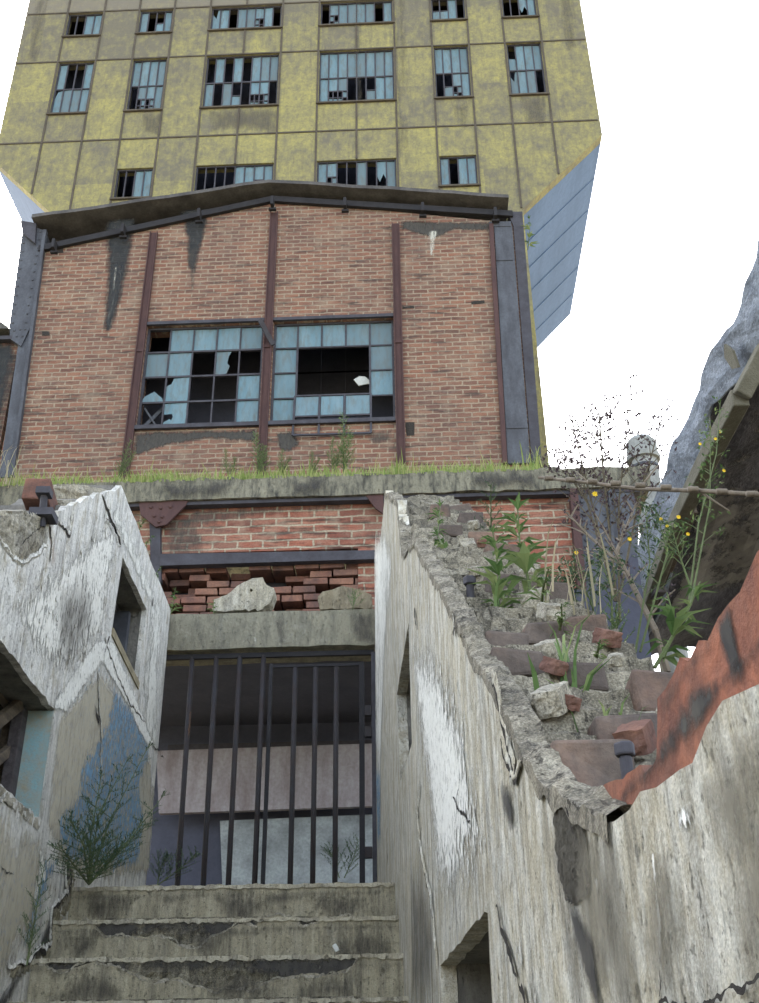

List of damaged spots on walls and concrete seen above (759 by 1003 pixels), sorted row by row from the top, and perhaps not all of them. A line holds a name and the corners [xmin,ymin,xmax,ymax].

damp [105,219,133,330]
damp [183,209,207,270]
peeling [0,506,362,1003]
crack [496,904,526,1003]
crack [659,970,759,1003]